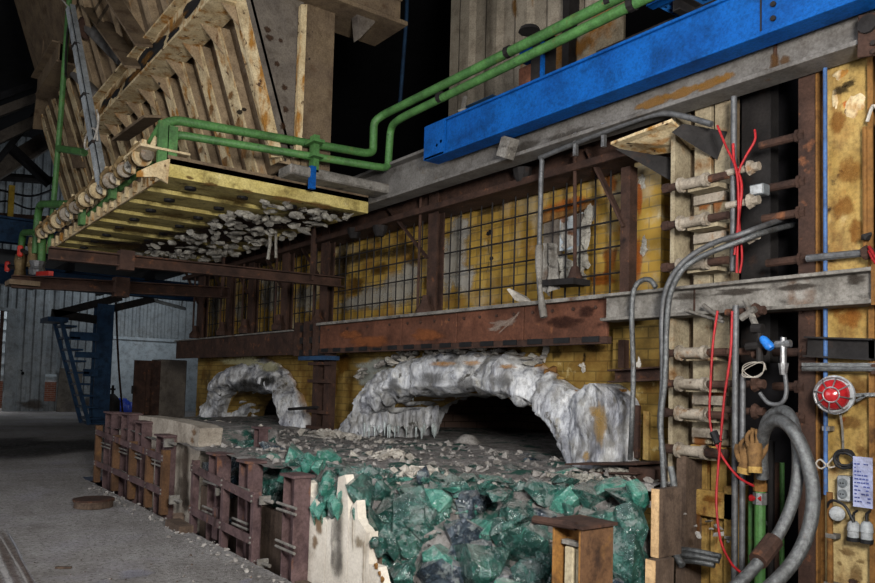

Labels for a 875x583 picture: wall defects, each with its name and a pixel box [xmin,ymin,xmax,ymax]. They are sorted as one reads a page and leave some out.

corrosion [832,113,844,131]
spalling [558,203,594,279]
leakage [340,263,417,310]
corrosion [550,307,594,328]